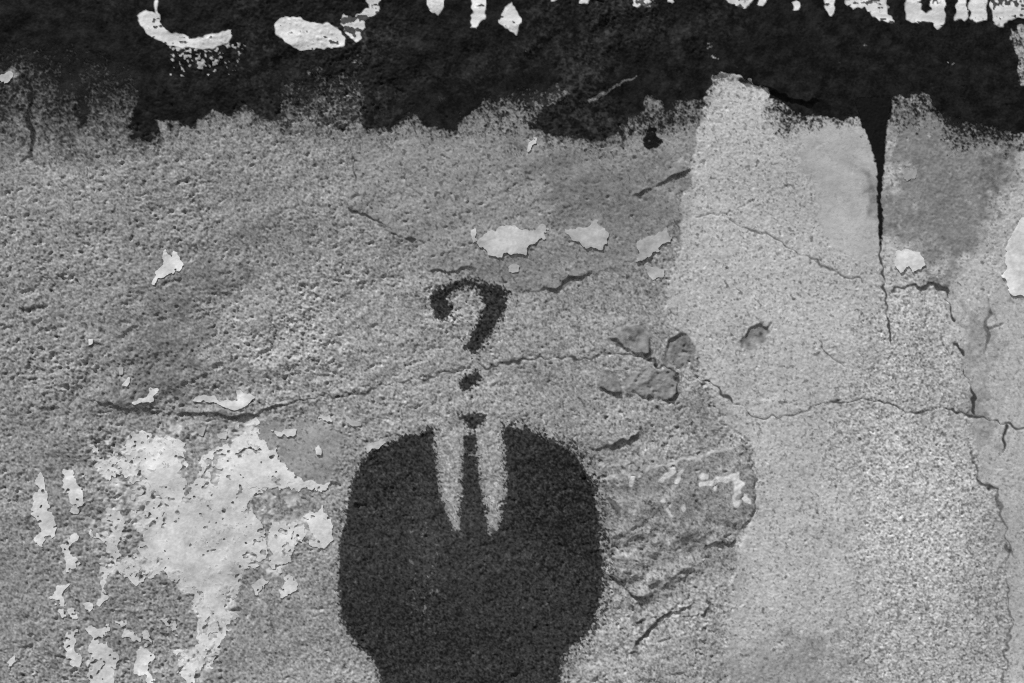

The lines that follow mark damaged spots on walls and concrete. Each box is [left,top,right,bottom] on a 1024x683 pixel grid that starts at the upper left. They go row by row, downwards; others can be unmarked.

peeling [152,249,184,285]
peeling [471,224,549,273]
peeling [564,219,609,250]
peeling [636,227,672,280]
peeling [894,249,925,273]
peeling [1001,217,1024,296]
flaking render [740,322,771,350]
crack [830,246,1018,448]
crack [288,371,452,405]
crack [481,353,679,394]
crack [706,380,795,420]
peeling [31,387,334,683]